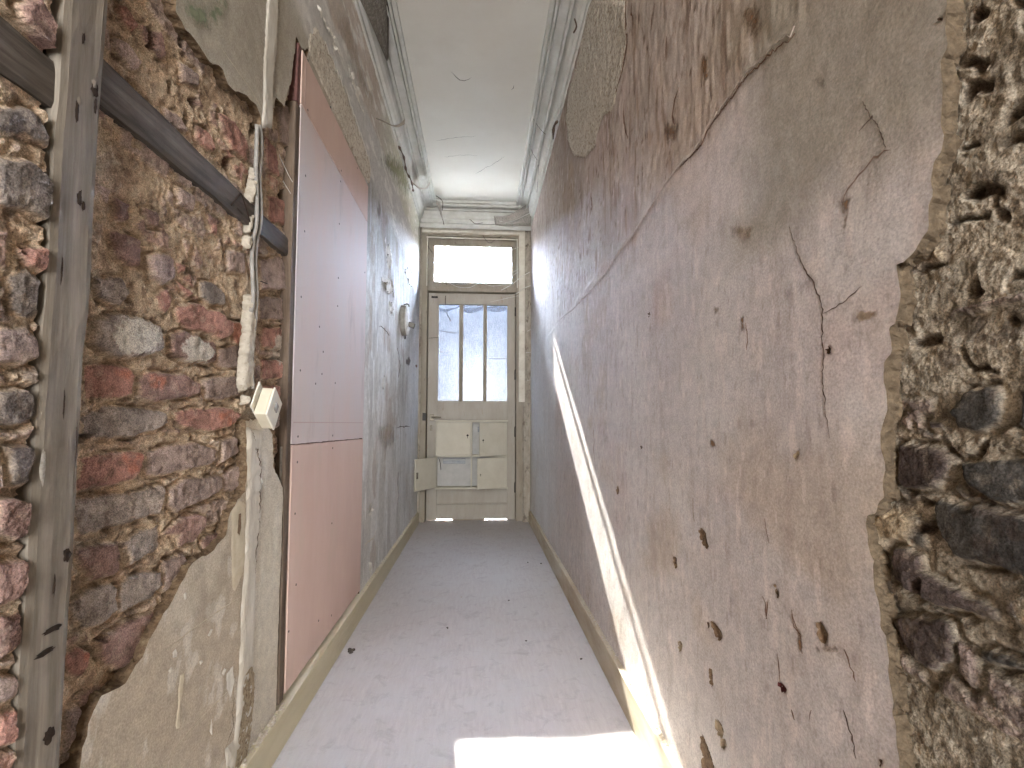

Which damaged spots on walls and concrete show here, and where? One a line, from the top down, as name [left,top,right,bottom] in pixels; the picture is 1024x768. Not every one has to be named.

flaking render [0,0,58,55]
flaking render [103,0,289,235]
crack [842,101,888,205]
flaking render [0,75,63,768]
flaking render [34,109,286,768]
crack [789,227,862,434]
flaking render [866,0,1024,768]